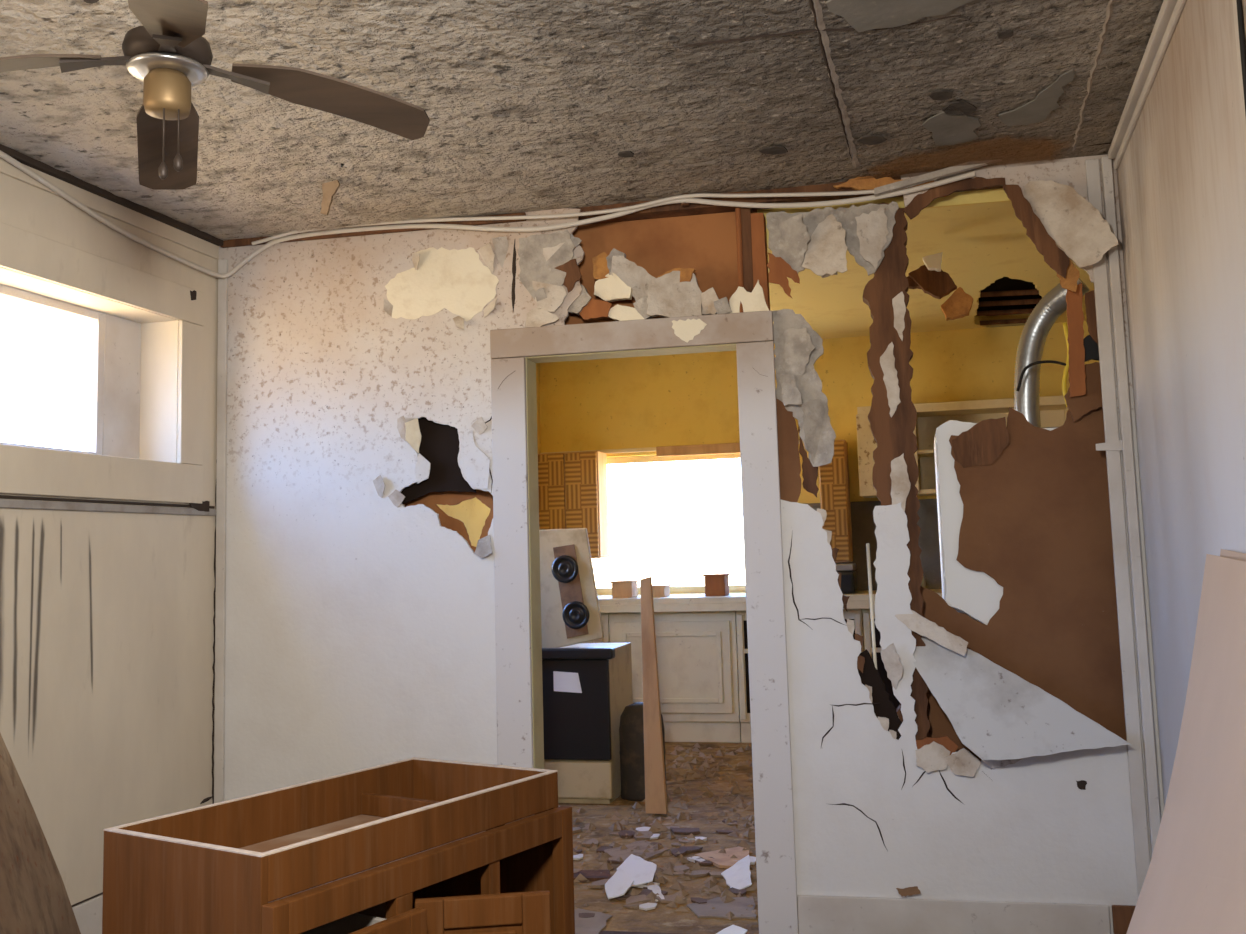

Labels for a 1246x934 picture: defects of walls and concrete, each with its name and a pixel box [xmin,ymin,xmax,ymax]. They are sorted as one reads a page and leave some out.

peeling [826,0,974,32]
peeling [384,230,582,329]
peeling [907,252,1036,321]
flaking render [373,416,493,507]
damp [0,523,44,735]
crack [821,703,877,746]
crack [901,752,962,803]
spalling [915,736,1023,777]
crack [831,803,886,848]